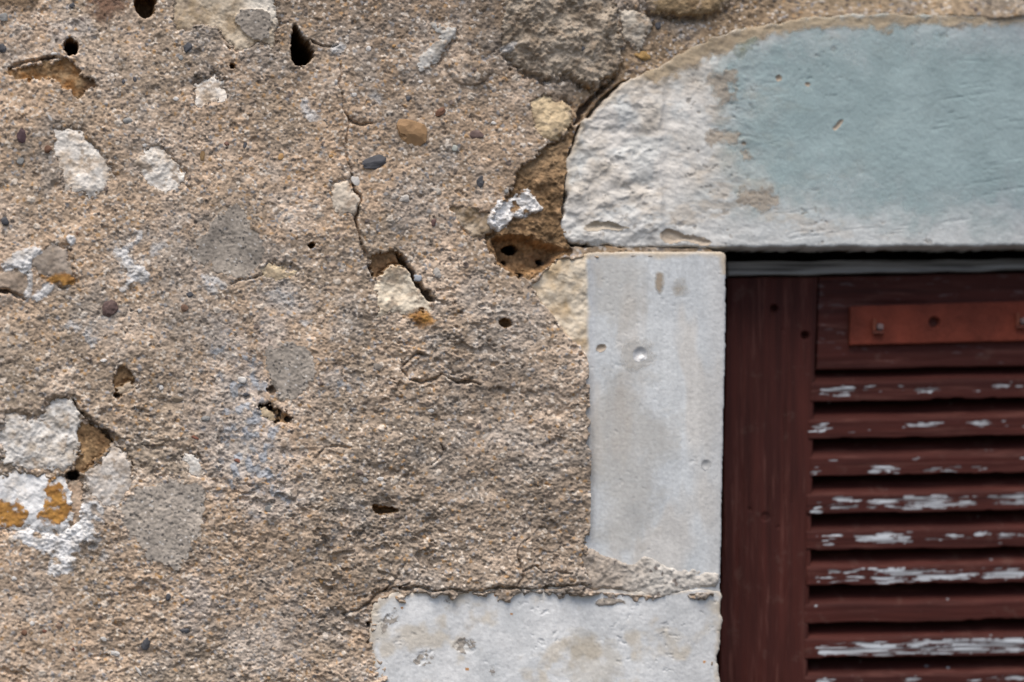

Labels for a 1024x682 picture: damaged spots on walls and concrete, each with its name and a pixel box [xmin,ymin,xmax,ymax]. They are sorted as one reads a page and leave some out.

spalling [8,56,96,99]
peeling [707,70,737,104]
spalling [450,95,574,280]
peeling [737,190,778,210]
spalling [660,228,712,246]
spalling [0,235,76,301]
spalling [0,398,132,532]